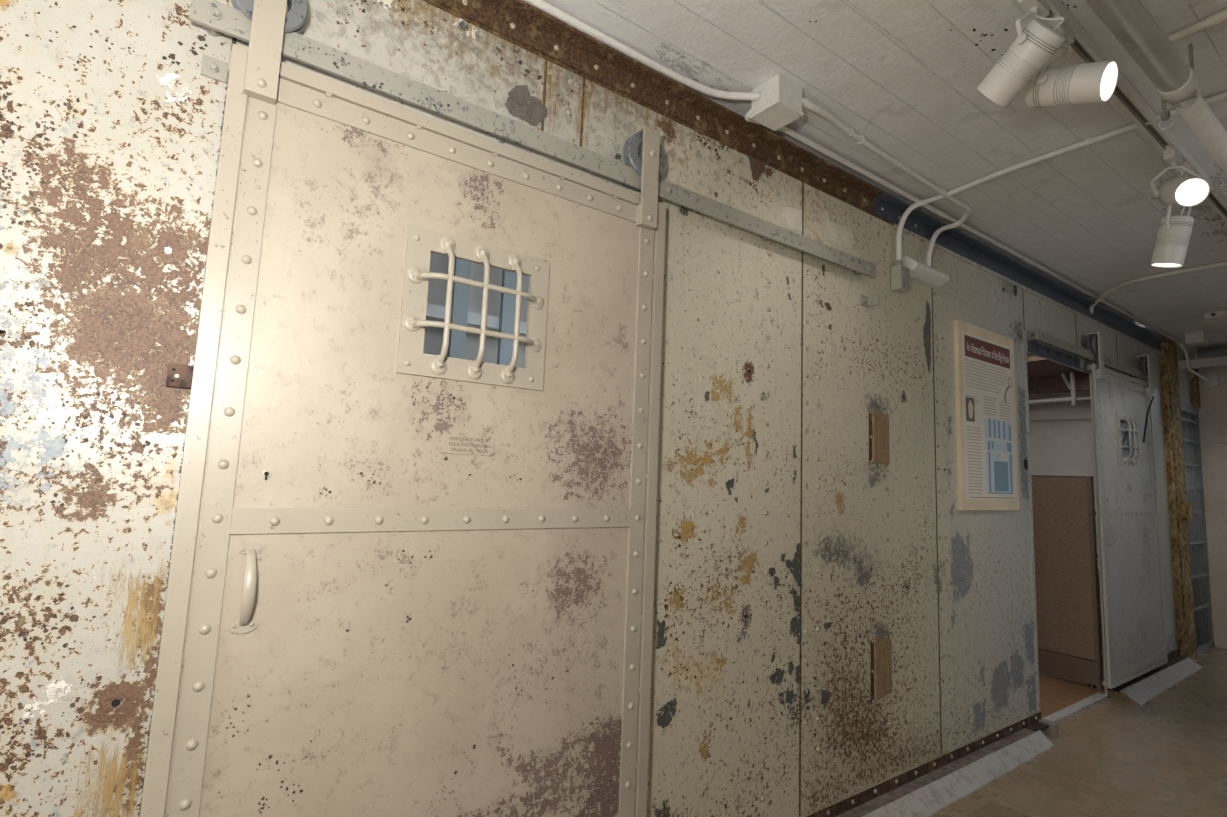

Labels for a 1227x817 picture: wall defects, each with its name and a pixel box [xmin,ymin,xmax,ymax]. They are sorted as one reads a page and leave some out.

peeling [69,0,134,75]
peeling [162,6,208,65]
peeling [0,81,55,249]
peeling [57,98,92,138]
corrosion [655,116,677,144]
corrosion [748,156,773,183]
peeling [0,278,87,320]
peeling [0,568,95,648]
peeling [651,524,744,729]
peeling [764,543,802,645]
peeling [63,675,102,721]
corrosion [798,638,946,816]